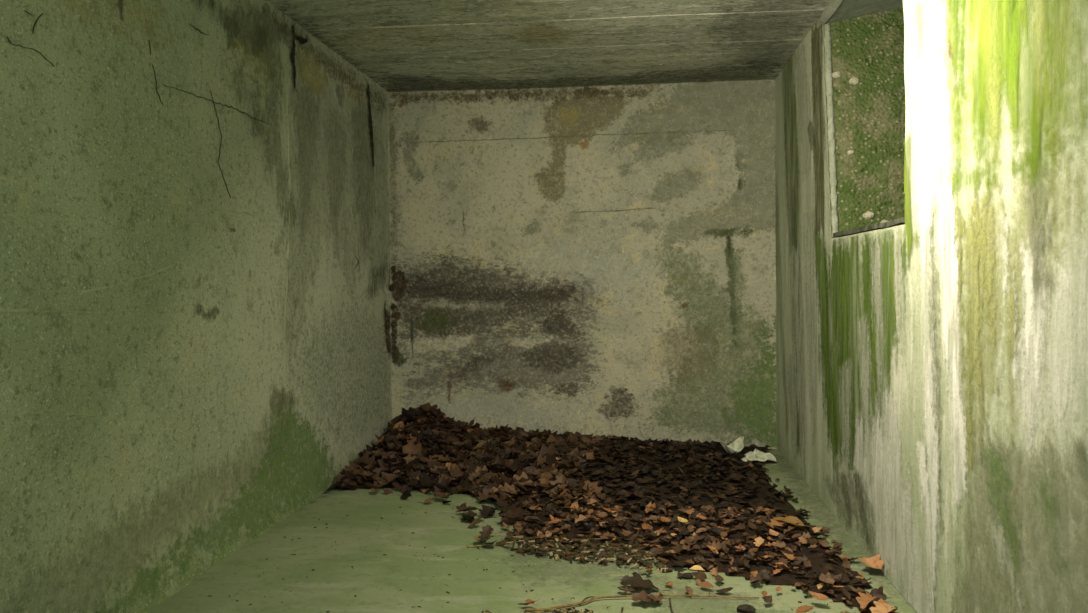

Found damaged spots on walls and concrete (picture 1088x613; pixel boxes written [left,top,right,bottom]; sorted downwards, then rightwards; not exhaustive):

crack [7,10,54,67]
crack [148,40,270,198]
water stain [199,0,771,224]
crack [367,85,734,166]
water stain [371,230,769,445]
water stain [774,0,1088,613]